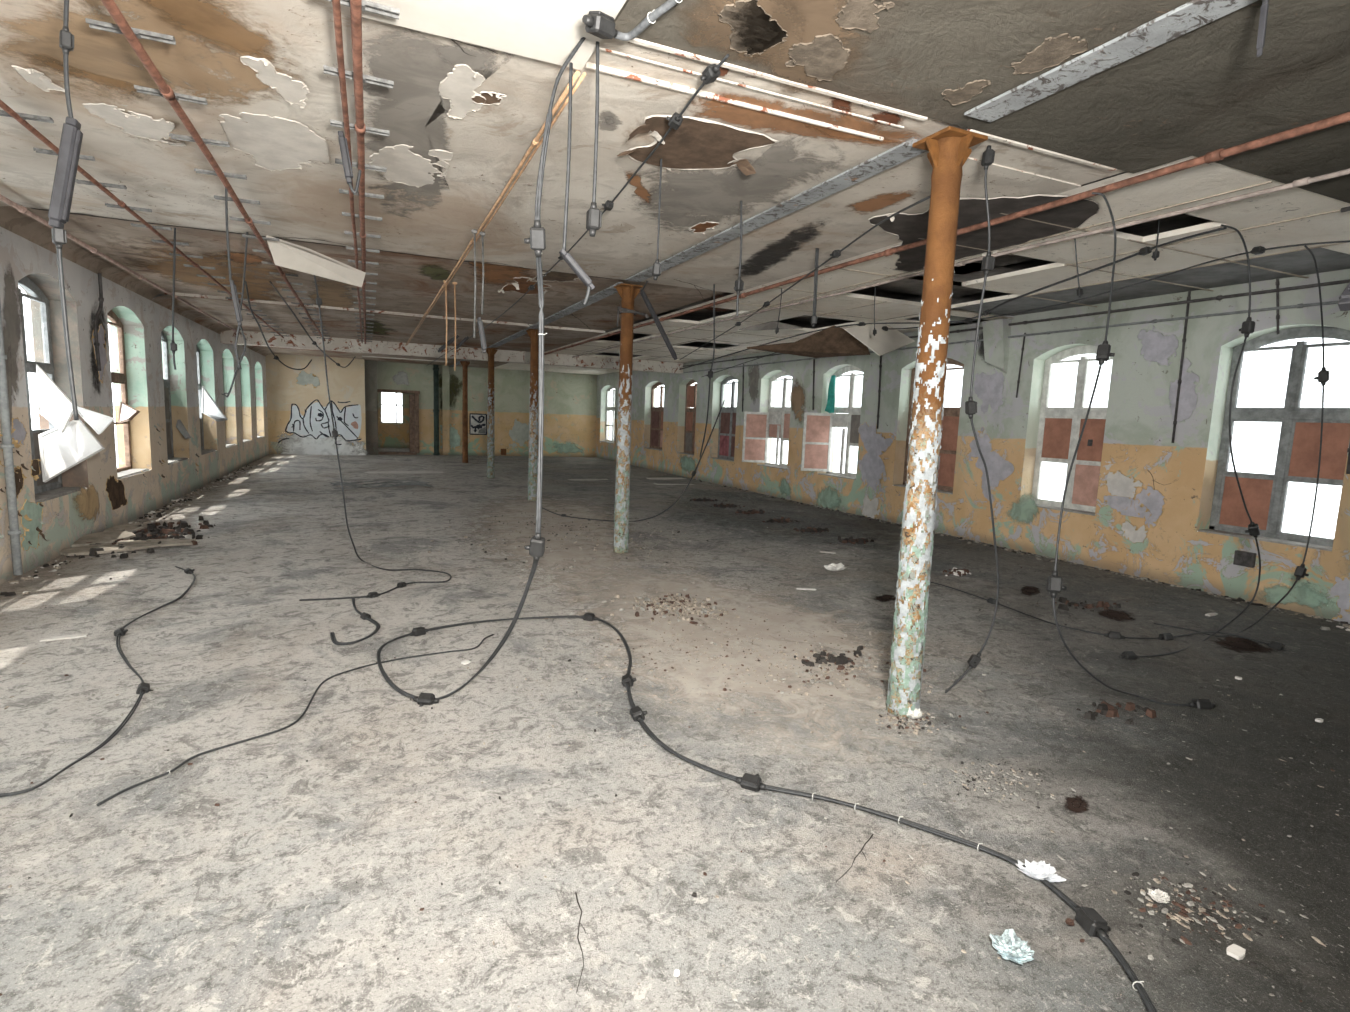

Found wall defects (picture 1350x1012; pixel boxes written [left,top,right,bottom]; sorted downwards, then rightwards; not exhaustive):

peeling [82,103,187,146]
leakage [0,0,297,105]
peeling [219,56,329,172]
peeling [369,144,453,188]
peeling [439,64,507,119]
spalling [617,114,779,176]
peeling [718,0,895,81]
spalling [838,194,1100,715]
peeling [1103,461,1165,543]
peeling [1271,904,1350,953]